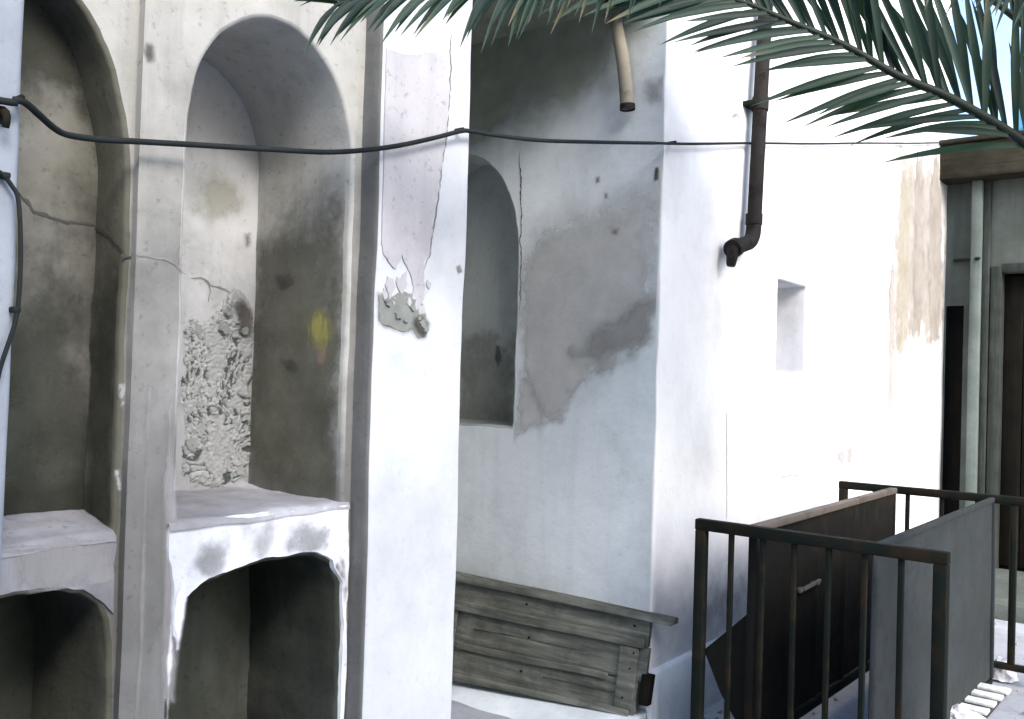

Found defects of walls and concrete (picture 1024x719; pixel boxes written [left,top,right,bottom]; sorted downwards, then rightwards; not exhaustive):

crack [19,193,231,302]
flaking render [179,288,254,488]
leakage [250,200,343,496]
flaking render [378,49,450,339]
crack [516,153,524,315]
leakage [460,198,654,431]